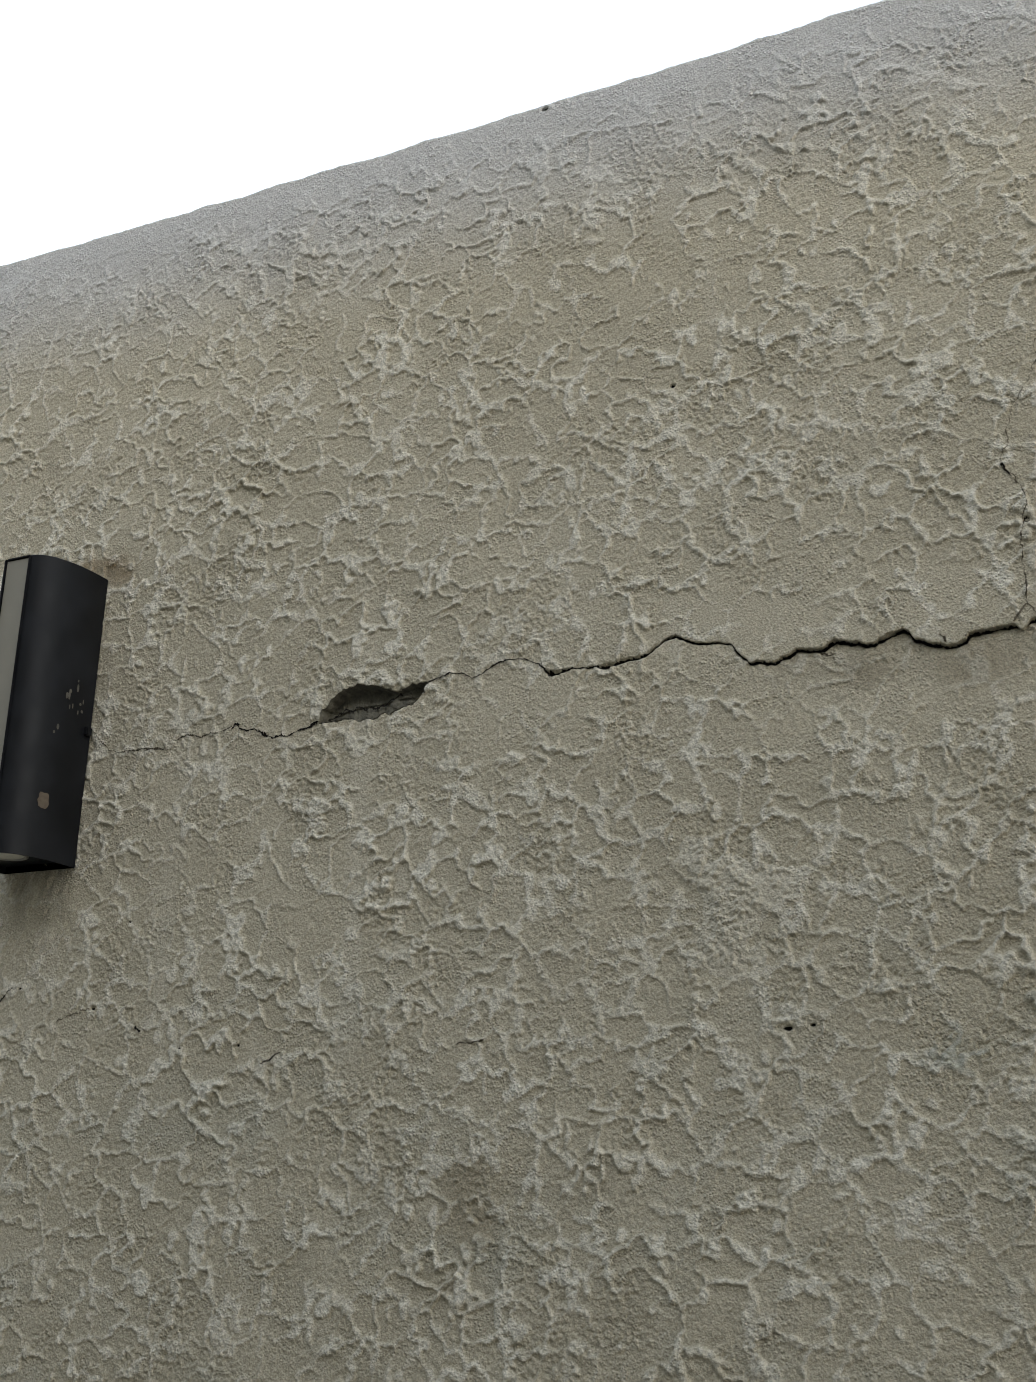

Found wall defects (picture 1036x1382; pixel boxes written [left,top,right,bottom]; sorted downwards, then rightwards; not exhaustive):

crack [429,338,1036,682]
spalling [319,682,428,724]